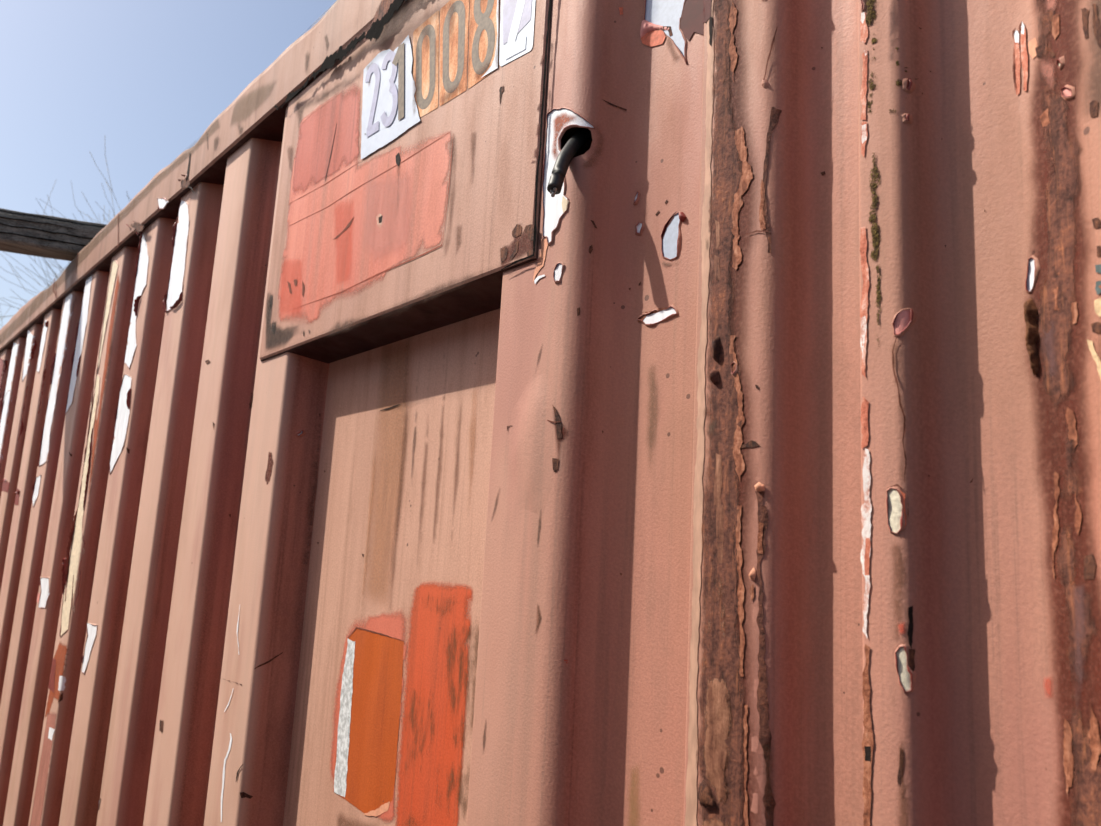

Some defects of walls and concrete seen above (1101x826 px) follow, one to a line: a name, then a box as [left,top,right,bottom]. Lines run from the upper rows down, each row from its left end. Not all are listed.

rust [342,0,427,50]
peeling [640,0,711,64]
peeling [1012,22,1038,95]
peeling [157,175,190,313]
peeling [533,107,595,284]
peeling [661,211,686,266]
peeling [637,304,679,327]
rust [696,0,759,826]
rust [1030,0,1101,826]
peeling [886,484,909,535]
peeling [860,397,874,826]
peeling [894,606,917,694]